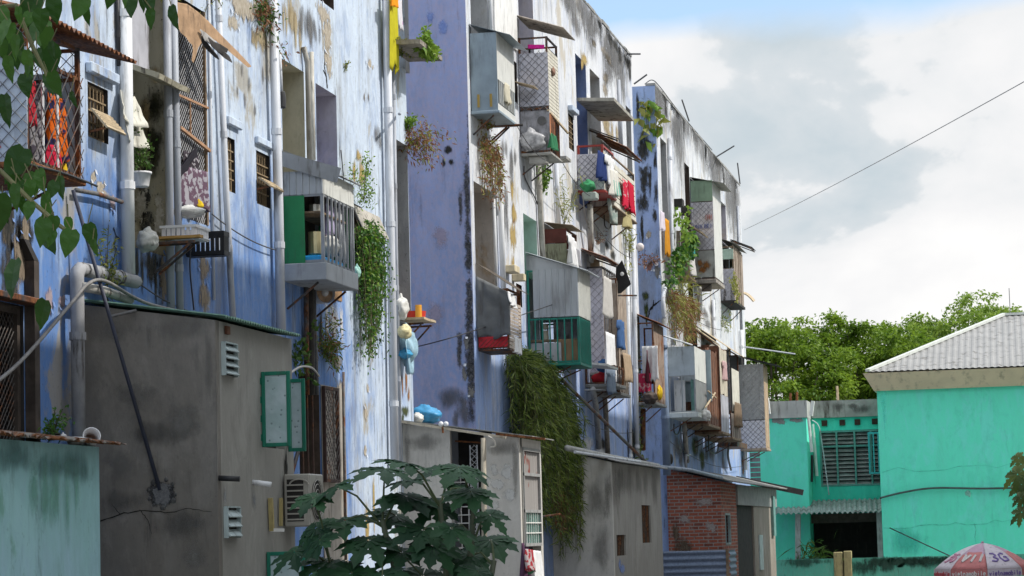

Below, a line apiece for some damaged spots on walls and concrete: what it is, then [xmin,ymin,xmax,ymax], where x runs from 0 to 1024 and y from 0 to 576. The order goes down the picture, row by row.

peeling [228,0,259,31]
peeling [315,0,333,78]
damp [637,132,658,242]
damp [655,86,739,238]
damp [442,115,475,425]
damp [2,447,87,511]
crack [100,505,210,534]
spalling [147,477,177,510]